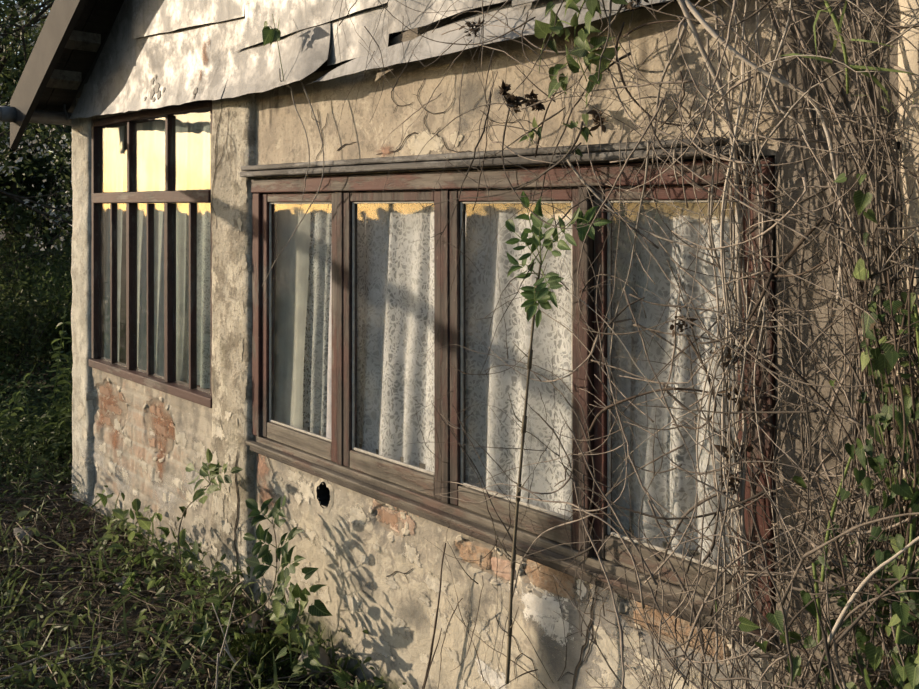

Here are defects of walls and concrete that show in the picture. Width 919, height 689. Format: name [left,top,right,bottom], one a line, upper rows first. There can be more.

peeling [237,179,247,232]
peeling [240,375,248,404]
spalling [77,378,139,497]
peeling [216,411,238,440]
spalling [138,397,233,579]
peeling [299,562,330,604]
peeling [289,519,343,576]
peeling [339,499,490,643]
spalling [452,535,593,648]
peeling [459,659,506,689]